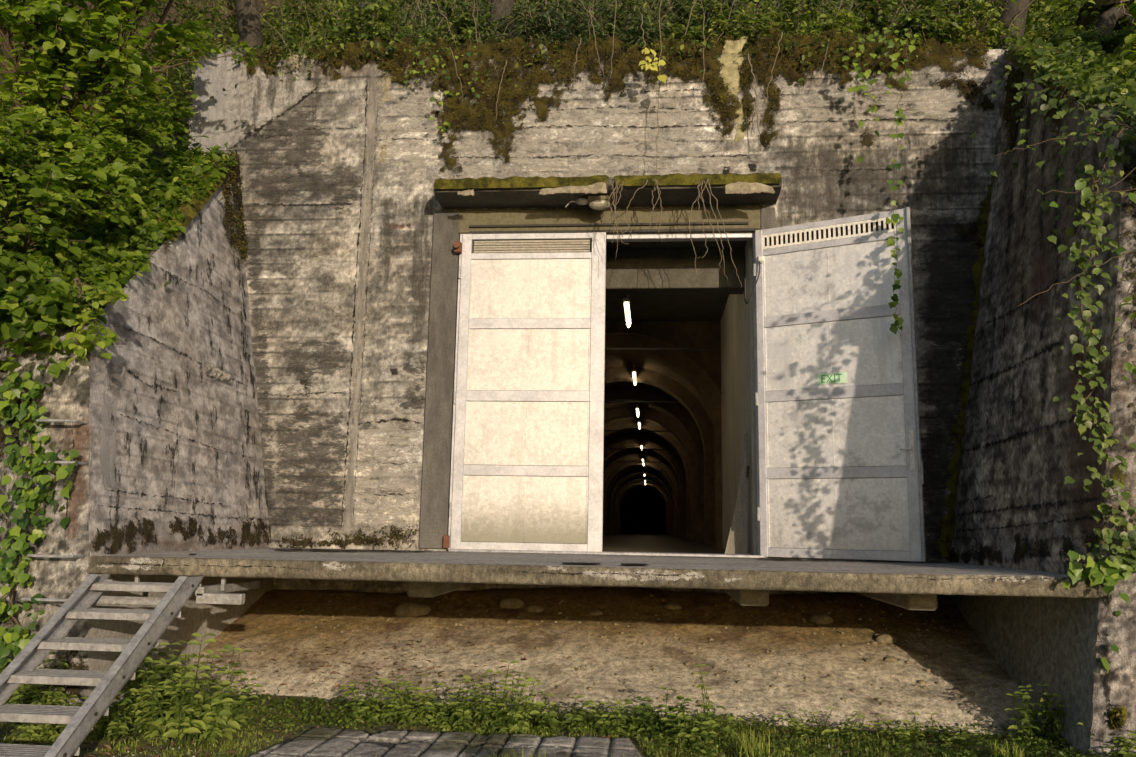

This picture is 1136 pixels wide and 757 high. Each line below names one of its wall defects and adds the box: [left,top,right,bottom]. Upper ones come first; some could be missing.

water stain [109,413,147,545]
water stain [154,67,766,539]
water stain [775,71,985,559]
water stain [985,107,1082,441]